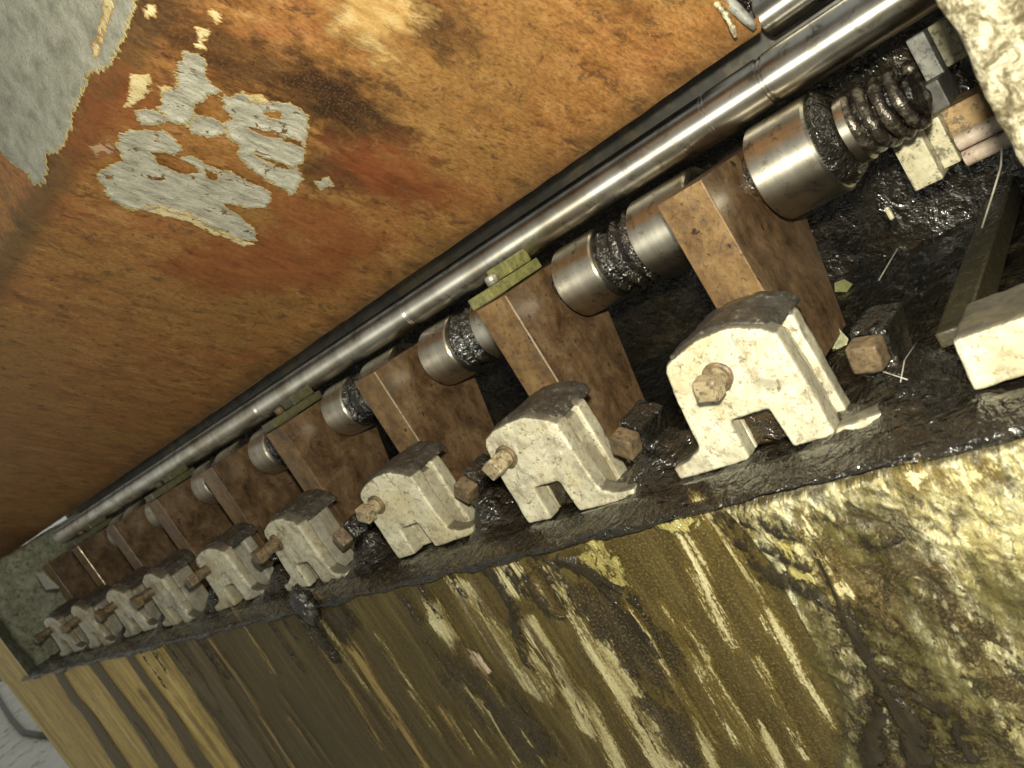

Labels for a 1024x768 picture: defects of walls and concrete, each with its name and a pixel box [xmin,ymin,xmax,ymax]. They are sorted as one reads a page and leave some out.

peeling [0,0,158,186]
peeling [89,8,334,247]
corrosion [208,35,399,138]
corrosion [312,159,410,196]
corrosion [327,0,453,72]
leakage [48,662,130,768]
leakage [82,629,295,768]
leakage [318,619,430,768]
leakage [372,630,523,768]
leakage [420,520,816,768]
leakage [689,491,839,733]